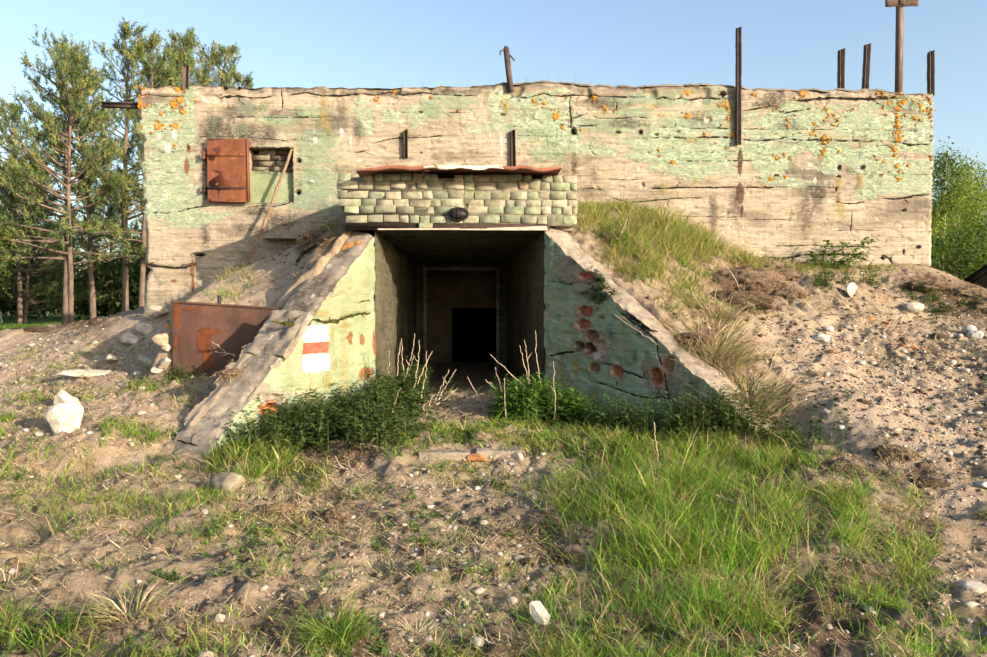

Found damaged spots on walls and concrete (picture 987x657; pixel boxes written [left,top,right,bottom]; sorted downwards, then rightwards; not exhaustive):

peeling [140,85,343,231]
peeling [354,86,934,200]
rust [737,149,745,218]
crack [545,350,578,358]
peeling [555,255,628,381]
crack [591,311,684,415]